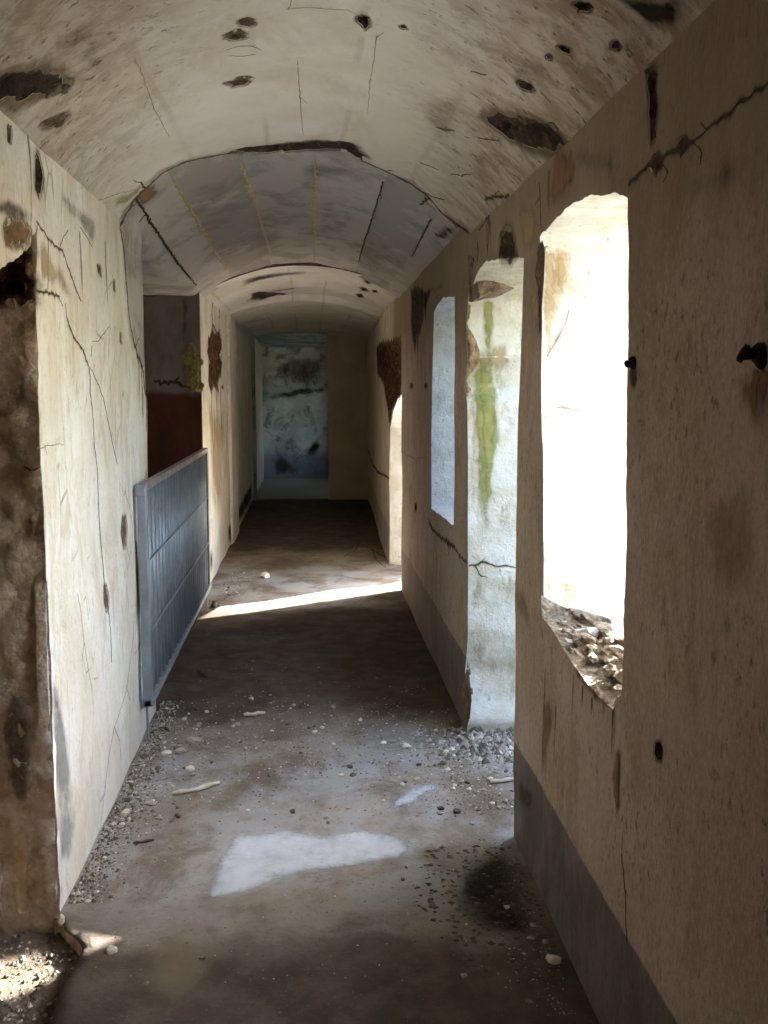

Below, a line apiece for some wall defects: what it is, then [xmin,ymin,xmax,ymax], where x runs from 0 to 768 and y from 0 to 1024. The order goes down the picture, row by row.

spalling [223,17,257,41]
spalling [0,63,74,111]
spalling [481,107,568,157]
spalling [644,64,662,173]
crack [628,82,768,187]
crack [358,181,384,262]
crack [98,178,228,364]
spalling [207,326,222,395]
leakage [485,302,493,349]
leakage [480,371,495,487]
crack [36,221,134,796]
crack [428,519,516,578]